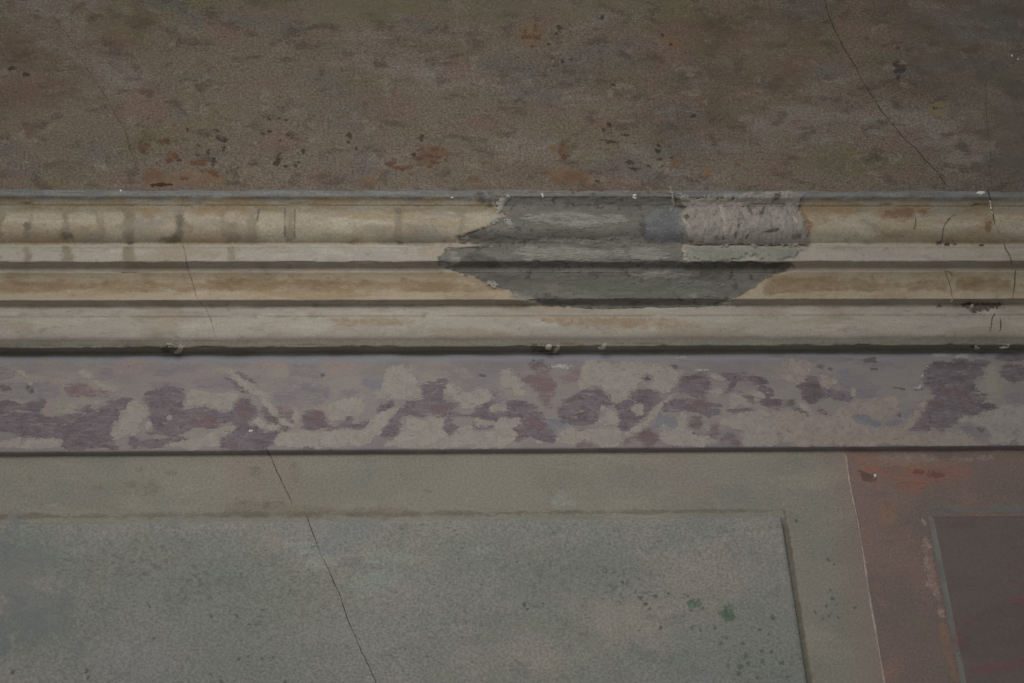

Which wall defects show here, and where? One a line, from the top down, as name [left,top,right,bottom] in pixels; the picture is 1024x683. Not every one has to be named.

flaking render [437,189,795,309]
crack [824,0,946,185]
crack [977,75,1016,294]
peeling [0,343,1024,451]
crack [266,449,376,682]